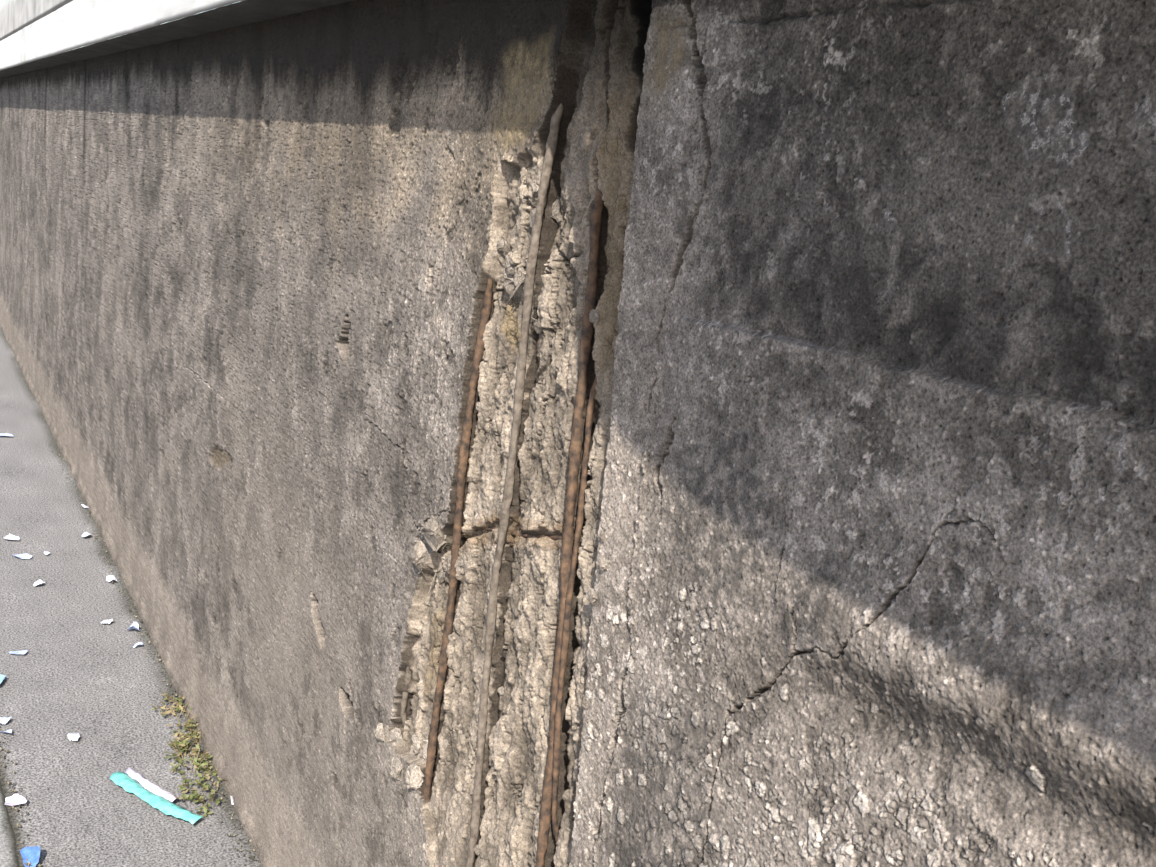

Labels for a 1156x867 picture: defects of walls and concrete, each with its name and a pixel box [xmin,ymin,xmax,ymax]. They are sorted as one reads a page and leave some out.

water stain [0,0,569,138]
spalling [374,0,653,867]
crack [643,0,713,574]
crack [695,501,1007,867]